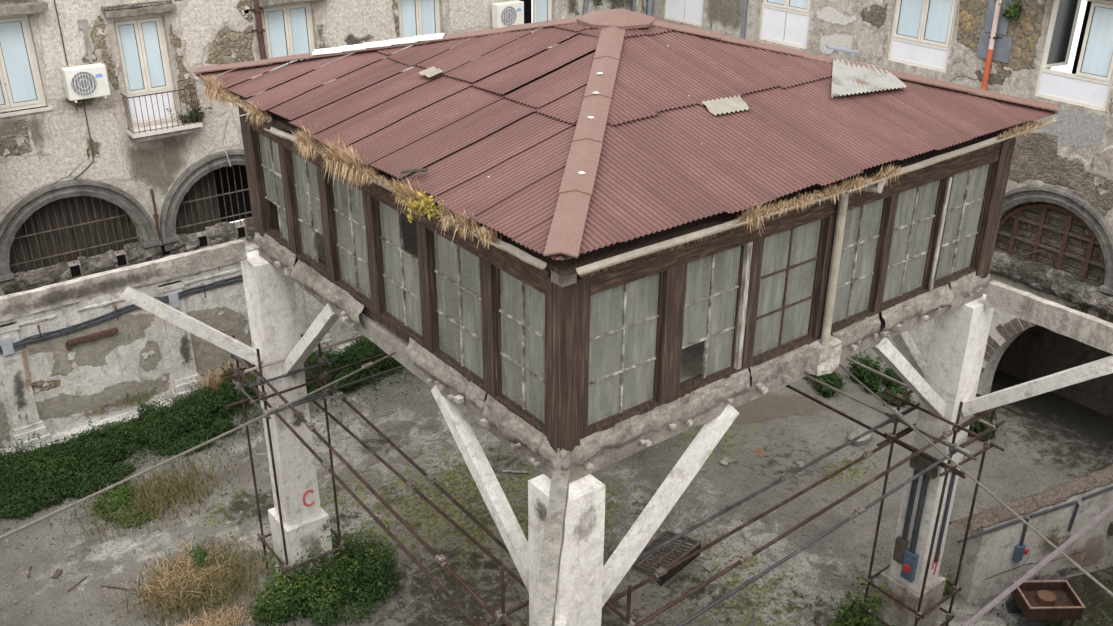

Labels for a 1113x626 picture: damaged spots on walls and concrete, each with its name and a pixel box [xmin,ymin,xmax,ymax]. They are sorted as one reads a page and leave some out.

peeling [316,0,400,49]
peeling [448,0,515,32]
peeling [0,0,131,213]
peeling [157,0,259,169]
peeling [1103,89,1113,123]
peeling [1007,129,1113,221]
peeling [25,311,173,422]